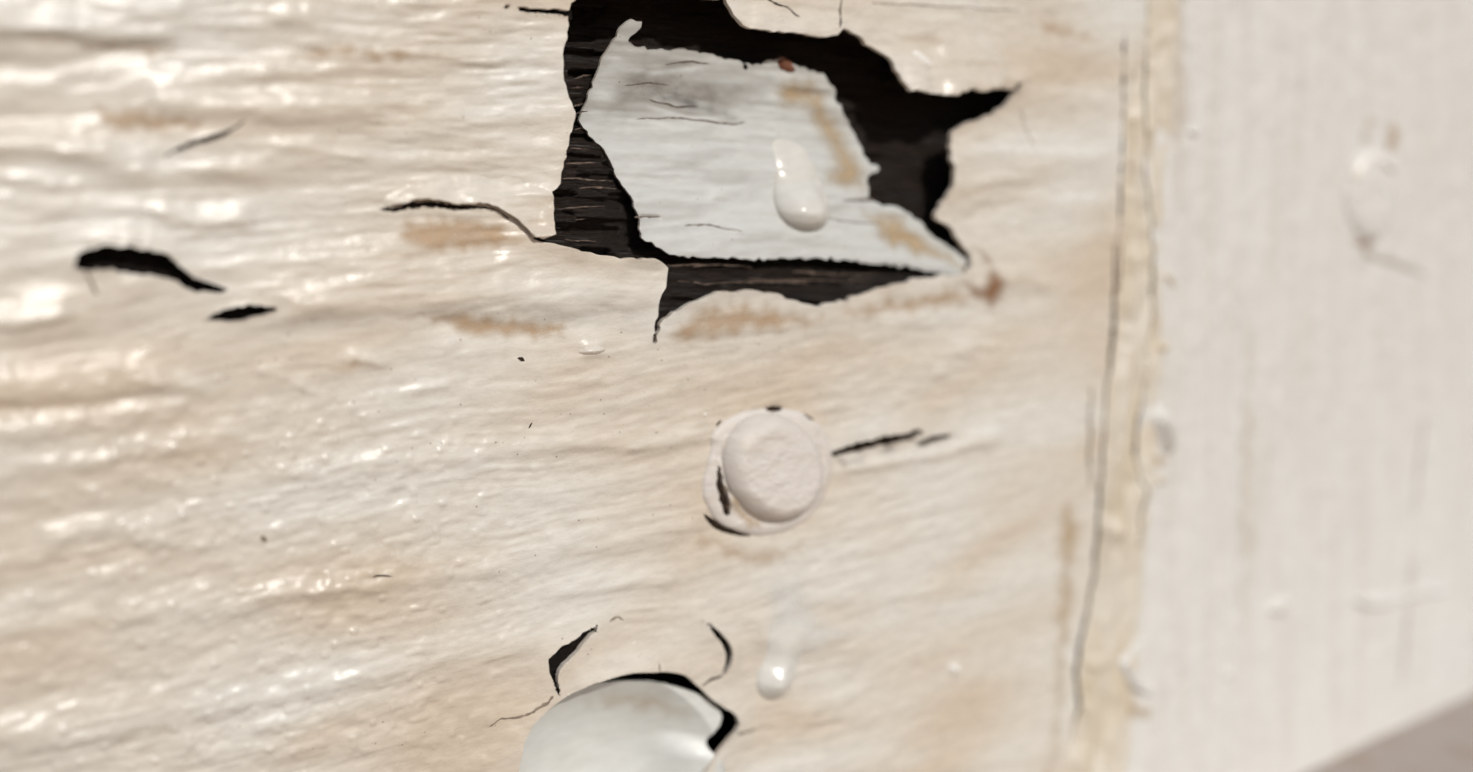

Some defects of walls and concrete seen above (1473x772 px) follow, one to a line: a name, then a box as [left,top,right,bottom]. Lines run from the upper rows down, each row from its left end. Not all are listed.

spalling [381,0,1034,343]
spalling [206,304,275,321]
crack [832,430,947,457]